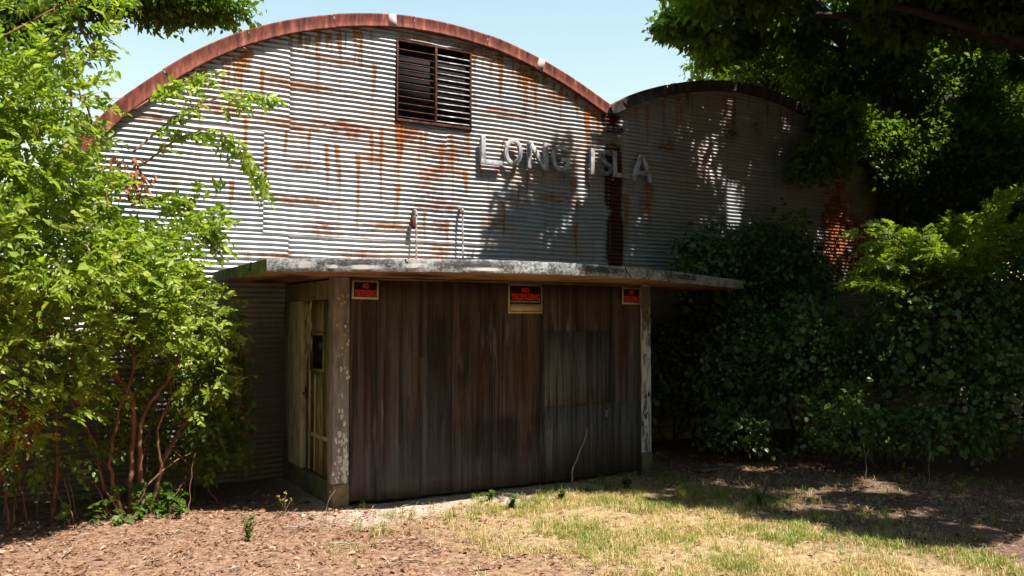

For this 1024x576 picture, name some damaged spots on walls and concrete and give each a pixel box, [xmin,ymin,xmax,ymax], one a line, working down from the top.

rust [222,49,253,85]
rust [260,69,331,96]
rust [289,28,376,80]
rust [246,194,335,206]
rust [273,118,384,223]
rust [395,122,482,265]
rust [456,45,652,266]
rust [822,173,876,287]
peeling [332,393,349,484]